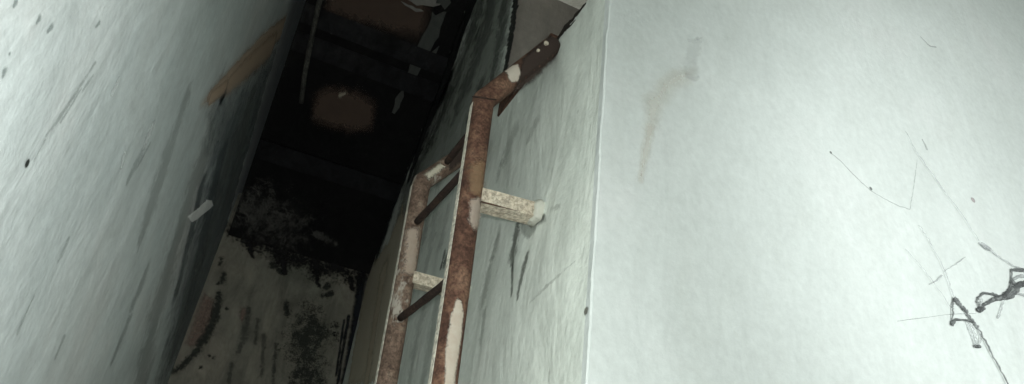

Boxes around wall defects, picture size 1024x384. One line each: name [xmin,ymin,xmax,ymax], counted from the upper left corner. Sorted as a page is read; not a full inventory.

water stain [278,202,404,384]